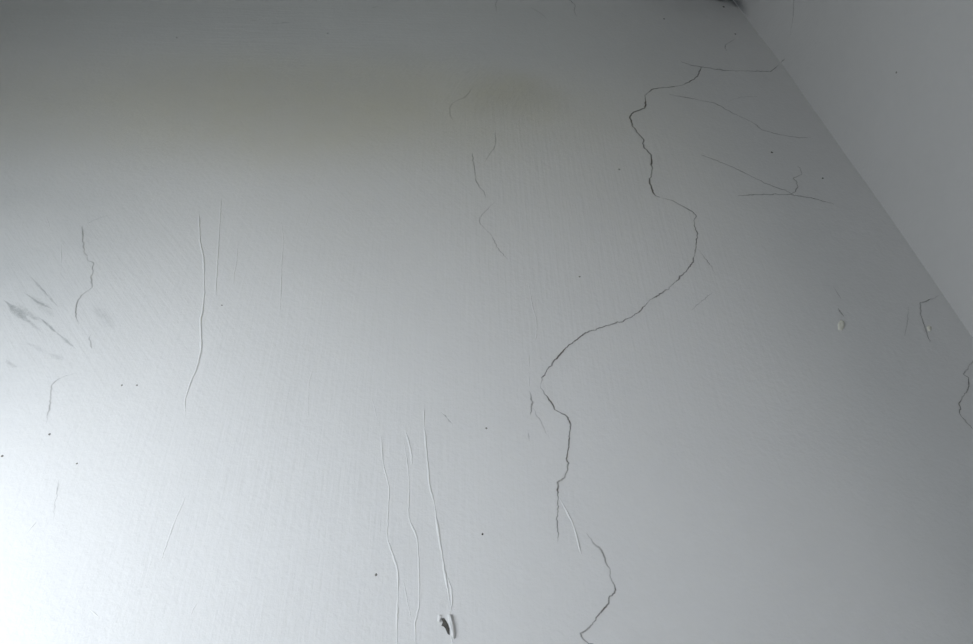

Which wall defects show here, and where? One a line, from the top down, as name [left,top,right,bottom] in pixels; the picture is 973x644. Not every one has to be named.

crack [541,65,731,526]